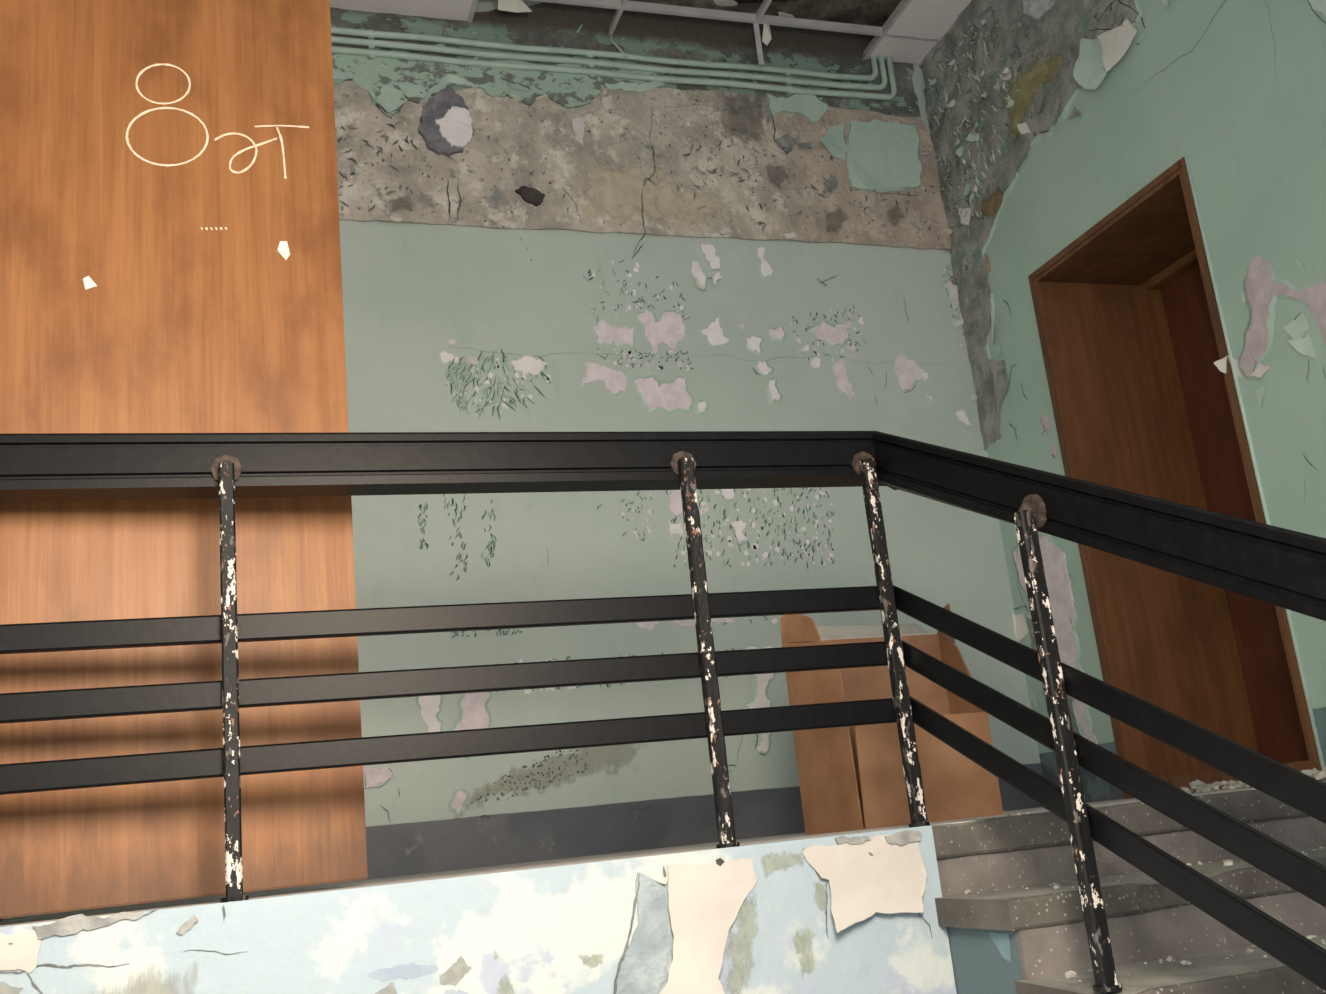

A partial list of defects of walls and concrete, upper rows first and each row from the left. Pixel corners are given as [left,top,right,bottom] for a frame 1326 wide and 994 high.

spalling [330,0,1145,458]
peeling [1214,253,1326,409]
peeling [443,494,497,581]
peeling [621,488,835,568]
peeling [1012,542,1037,651]
peeling [1038,532,1084,672]
peeling [416,691,505,732]
peeling [723,673,778,709]
peeling [1066,694,1097,744]
peeling [0,909,156,994]
peeling [613,858,757,994]
peeling [802,830,933,939]